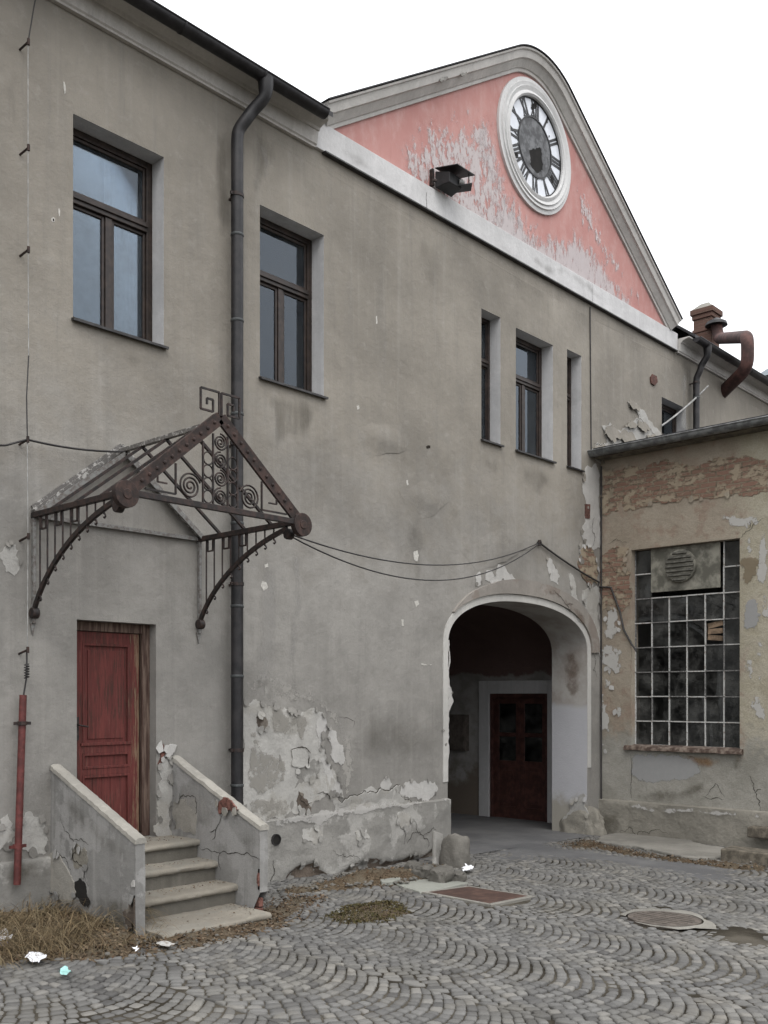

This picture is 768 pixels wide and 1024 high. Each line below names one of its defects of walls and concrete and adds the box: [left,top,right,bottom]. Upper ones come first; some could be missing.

peeling [407,111,639,305]
flaking render [0,540,23,576]
peeling [475,564,515,586]
flaking render [546,400,768,754]
flaking render [153,741,177,836]
flaking render [215,698,438,879]
flaking render [0,811,90,907]
crack [179,794,275,881]